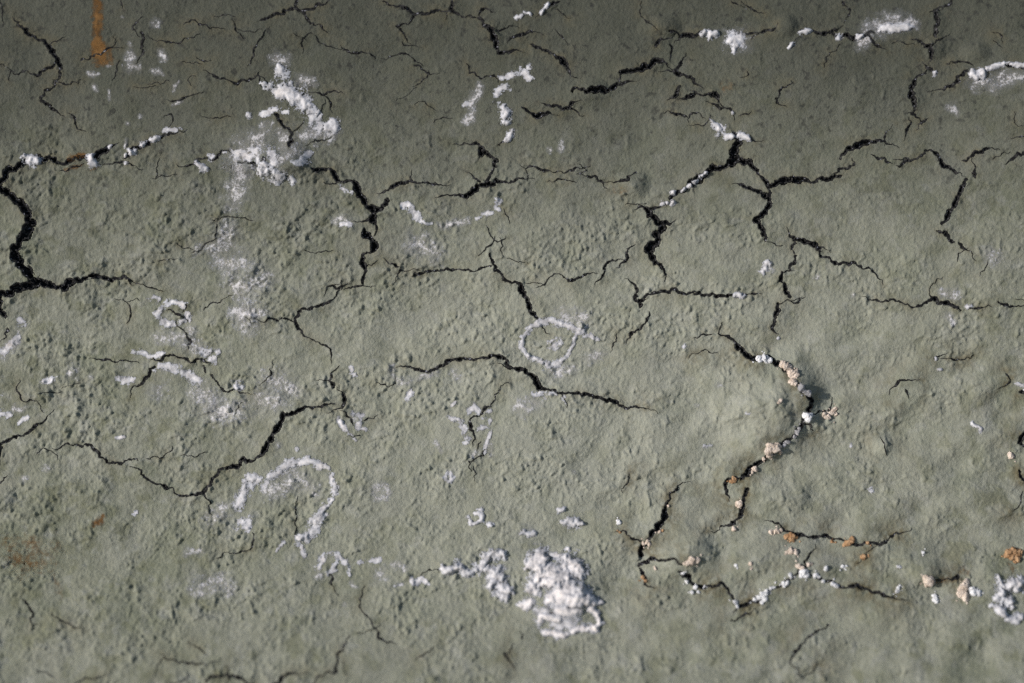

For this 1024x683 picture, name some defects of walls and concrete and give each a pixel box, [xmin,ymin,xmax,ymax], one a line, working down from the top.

rust [91,0,112,67]
water stain [461,64,535,143]
water stain [194,54,341,335]
crack [0,0,1024,515]
water stain [131,295,298,428]
water stain [198,445,430,587]
crack [615,323,912,622]
crack [154,642,247,683]
crack [274,574,396,683]
water stain [439,529,605,640]
crack [789,624,829,678]
water stain [988,573,1024,626]